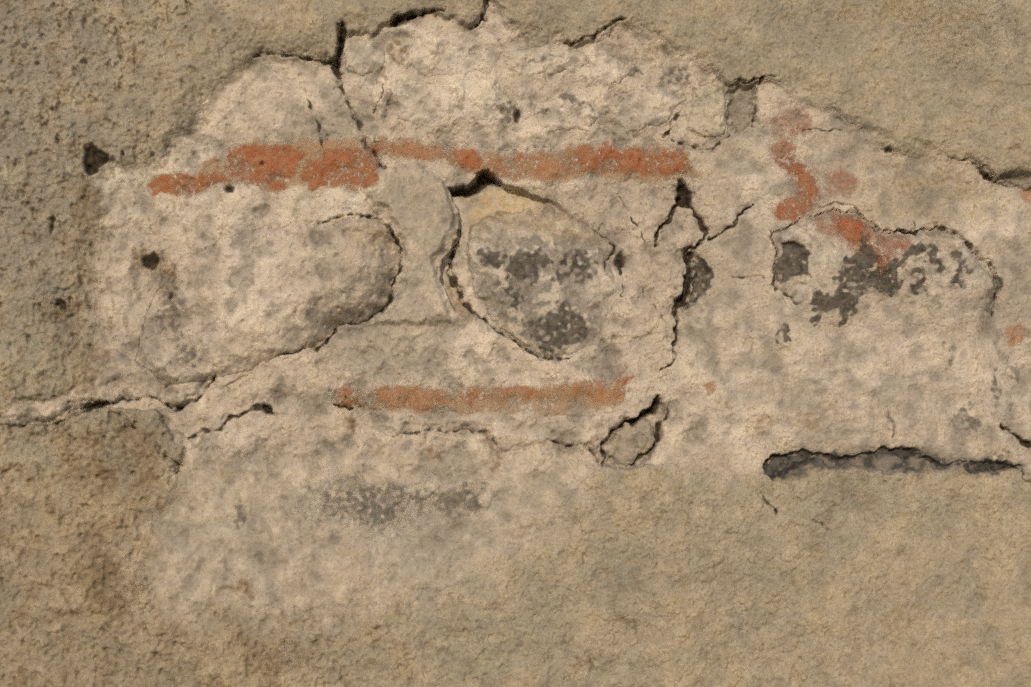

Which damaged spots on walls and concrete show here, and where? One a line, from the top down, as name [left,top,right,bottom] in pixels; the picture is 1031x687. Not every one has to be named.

crack [735,75,776,122]
spalling [277,138,320,148]
peeling [775,139,793,156]
peeling [784,164,818,206]
peeling [830,172,856,190]
crack [947,156,1008,187]
peeling [776,198,809,220]
peeling [815,213,912,270]
crack [761,423,1031,514]
spalling [788,442,1031,475]